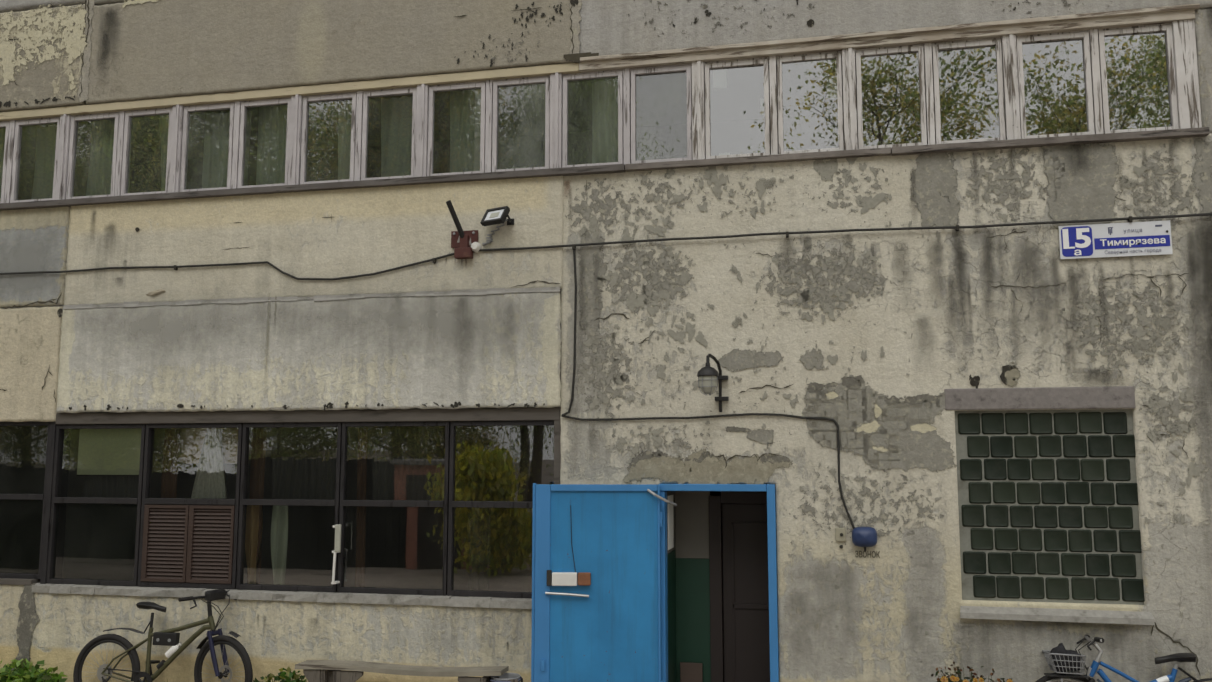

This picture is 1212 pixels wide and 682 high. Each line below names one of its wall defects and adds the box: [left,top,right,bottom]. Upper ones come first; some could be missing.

peeling [0,0,95,107]
water stain [103,10,115,56]
water stain [950,248,965,307]
water stain [984,238,1001,283]
water stain [1204,233,1212,312]
peeling [565,125,1212,557]
crack [1151,623,1200,674]